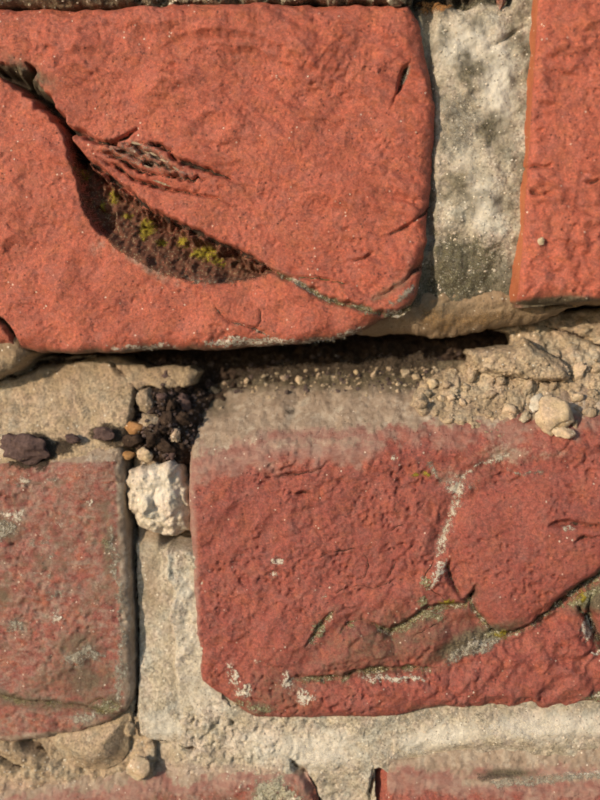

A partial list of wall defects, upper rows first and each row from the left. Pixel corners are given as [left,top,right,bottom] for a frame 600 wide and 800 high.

crack [396,67,409,95]
spalling [64,135,275,284]
crack [0,72,421,317]
crack [390,208,428,235]
crack [0,317,16,338]
crack [317,548,396,589]
crack [309,563,600,645]
crack [301,665,431,685]